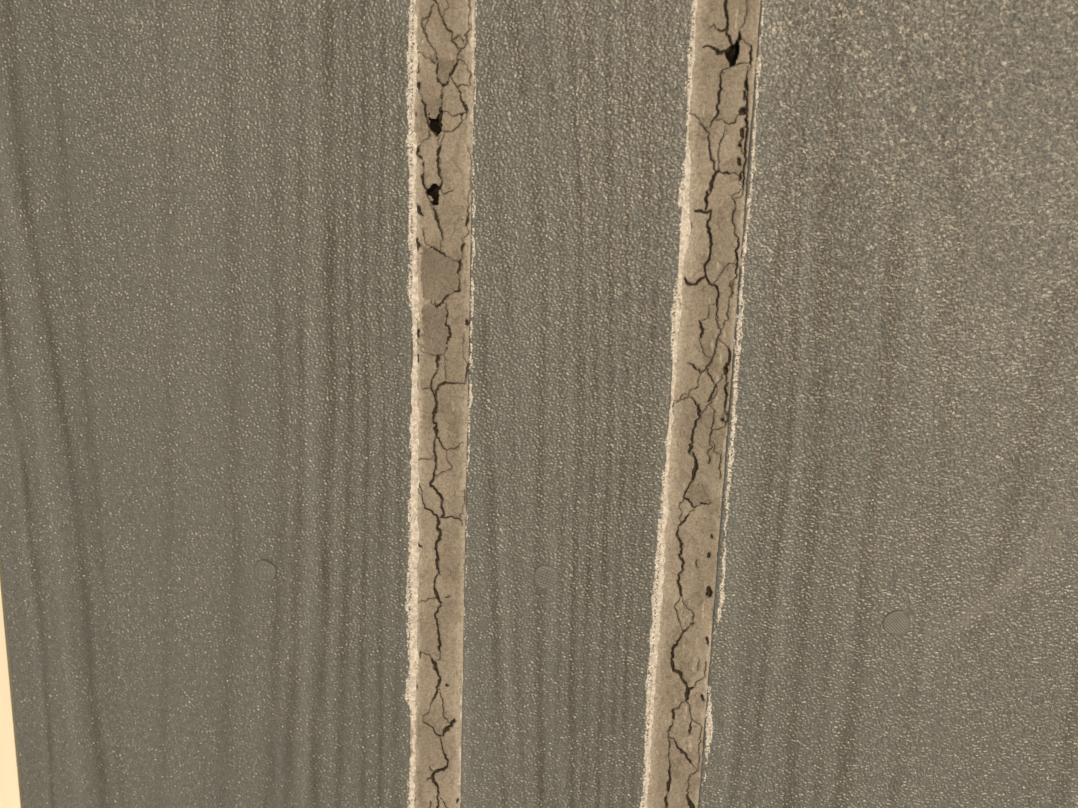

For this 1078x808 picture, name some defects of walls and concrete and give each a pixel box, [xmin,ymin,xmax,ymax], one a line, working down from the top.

spalling [415,97,442,119]
peeling [738,0,765,204]
crack [417,0,472,808]
spalling [416,147,476,487]
crack [667,0,752,775]
peeling [696,502,729,645]
peeling [697,662,713,782]